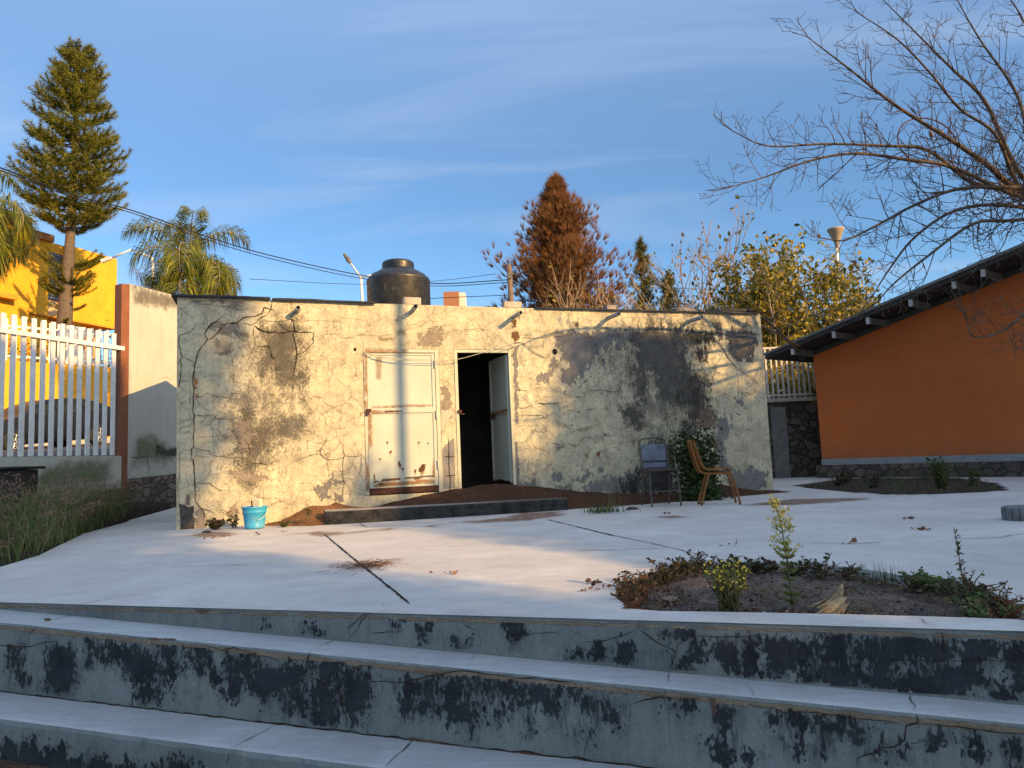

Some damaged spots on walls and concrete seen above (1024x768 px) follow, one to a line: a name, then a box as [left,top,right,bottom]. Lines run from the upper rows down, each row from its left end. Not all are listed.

peeling [417,326,444,348]
damp [223,388,306,489]
crack [163,299,486,517]
peeling [314,472,345,502]
corrosion [364,349,429,445]
corrosion [366,442,435,489]
crack [520,313,755,489]
damp [615,318,747,494]
damp [3,635,376,733]
damp [389,671,627,747]
damp [759,707,910,766]
damp [657,628,1024,702]